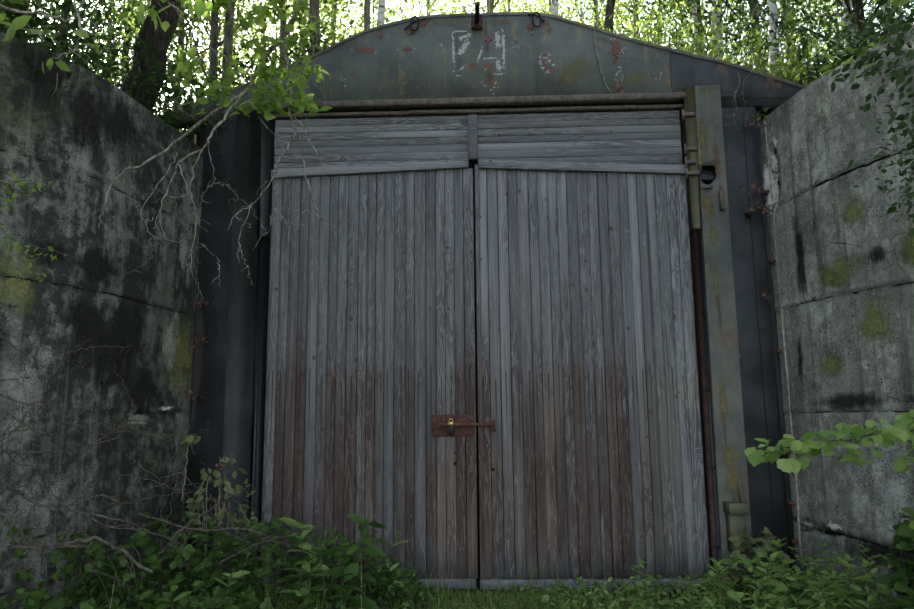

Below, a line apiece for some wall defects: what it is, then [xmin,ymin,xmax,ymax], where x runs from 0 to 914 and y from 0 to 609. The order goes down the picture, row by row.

crack [779,145,914,210]
crack [789,218,914,308]
water stain [868,246,884,264]
crack [0,276,191,316]